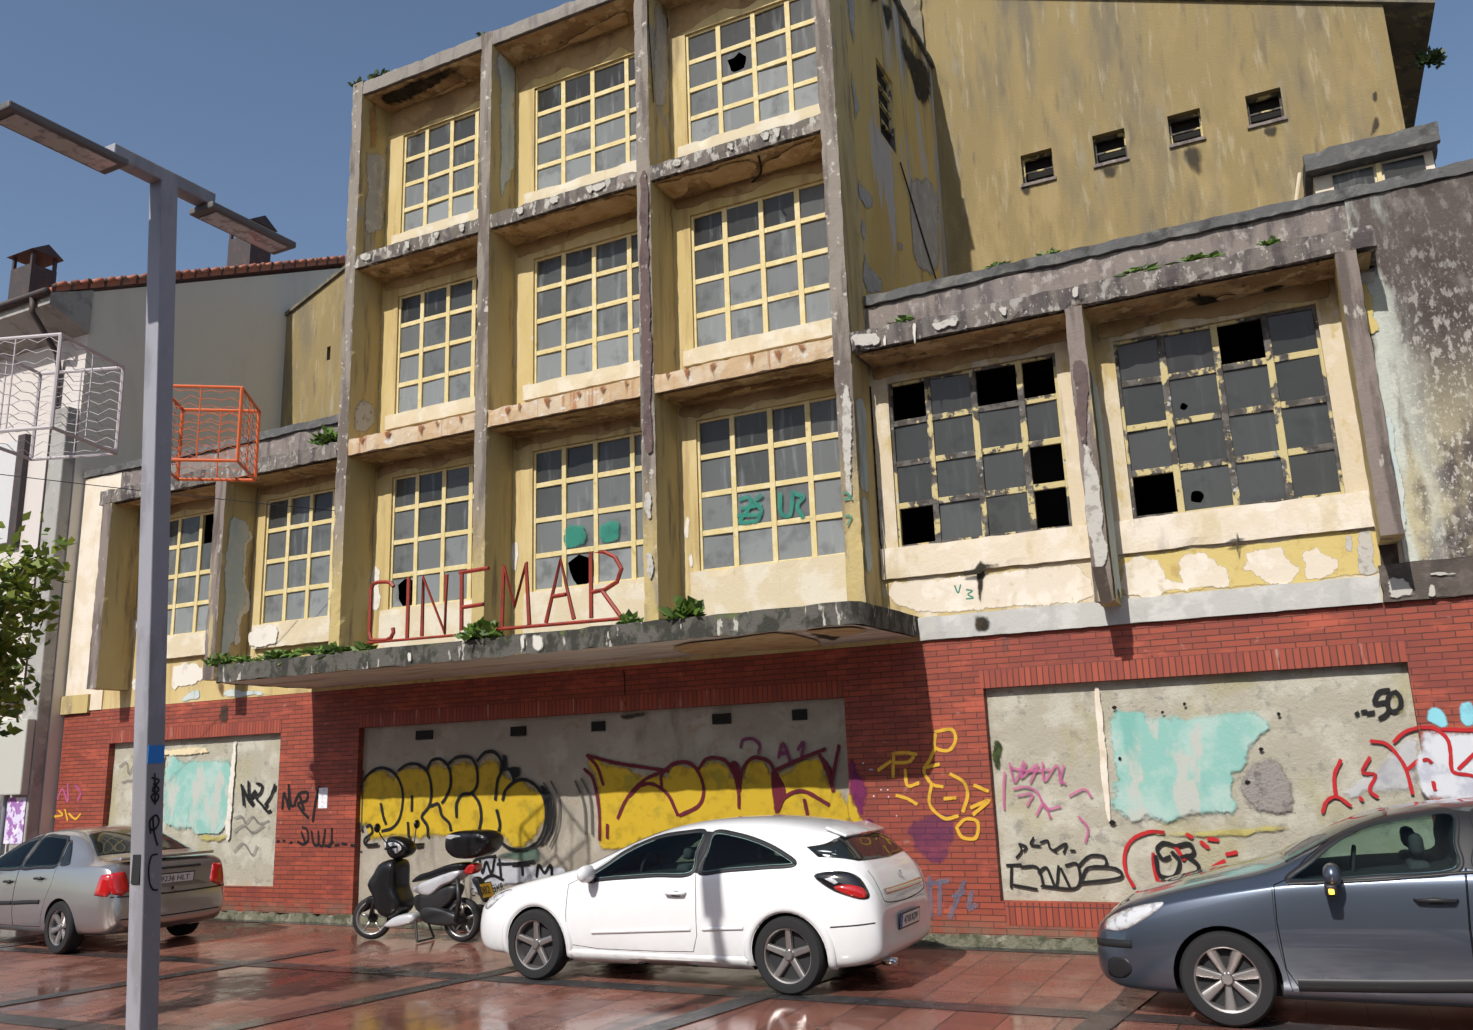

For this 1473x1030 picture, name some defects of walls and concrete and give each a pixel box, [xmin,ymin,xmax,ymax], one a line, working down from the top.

peeling [498,53,515,197]
peeling [365,152,385,234]
spalling [585,182,605,193]
peeling [858,182,882,294]
peeling [898,177,940,276]
peeling [888,360,1455,613]
peeling [221,517,278,655]
peeling [171,662,203,701]
peeling [223,689,263,698]
peeling [163,742,236,841]
peeling [1094,687,1294,825]